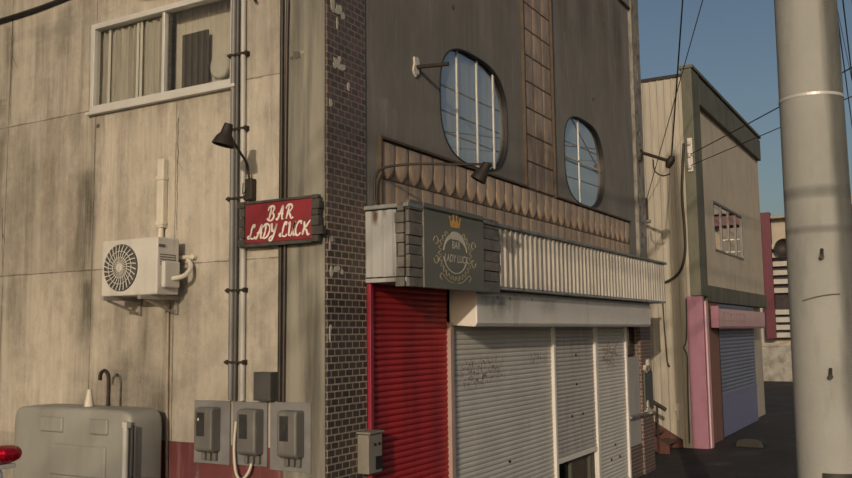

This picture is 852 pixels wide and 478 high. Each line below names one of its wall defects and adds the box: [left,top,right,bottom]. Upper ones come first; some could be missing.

peeling [330,0,345,29]
peeling [333,56,346,71]